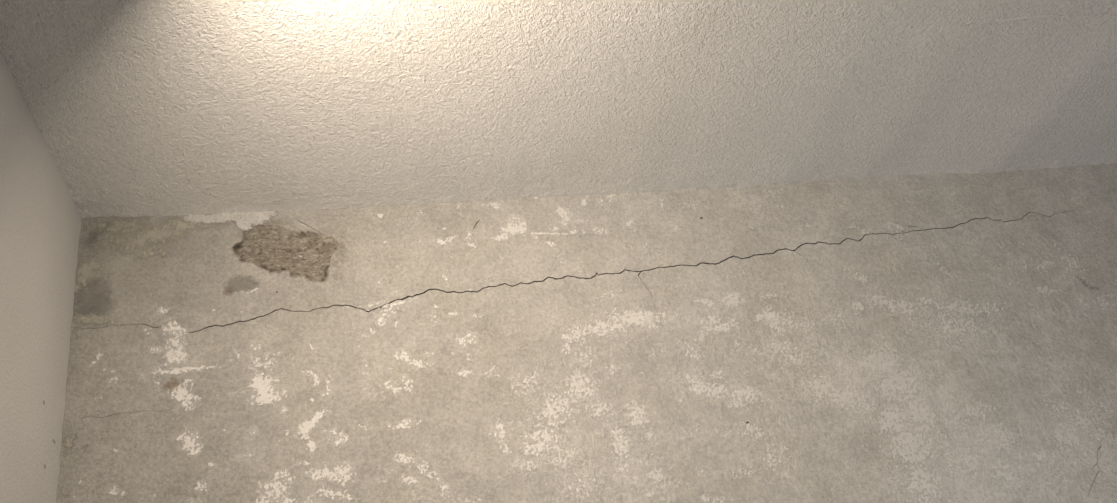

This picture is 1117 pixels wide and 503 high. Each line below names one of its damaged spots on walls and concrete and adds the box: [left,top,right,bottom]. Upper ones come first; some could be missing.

spalling [231,224,338,283]
crack [76,210,1074,334]